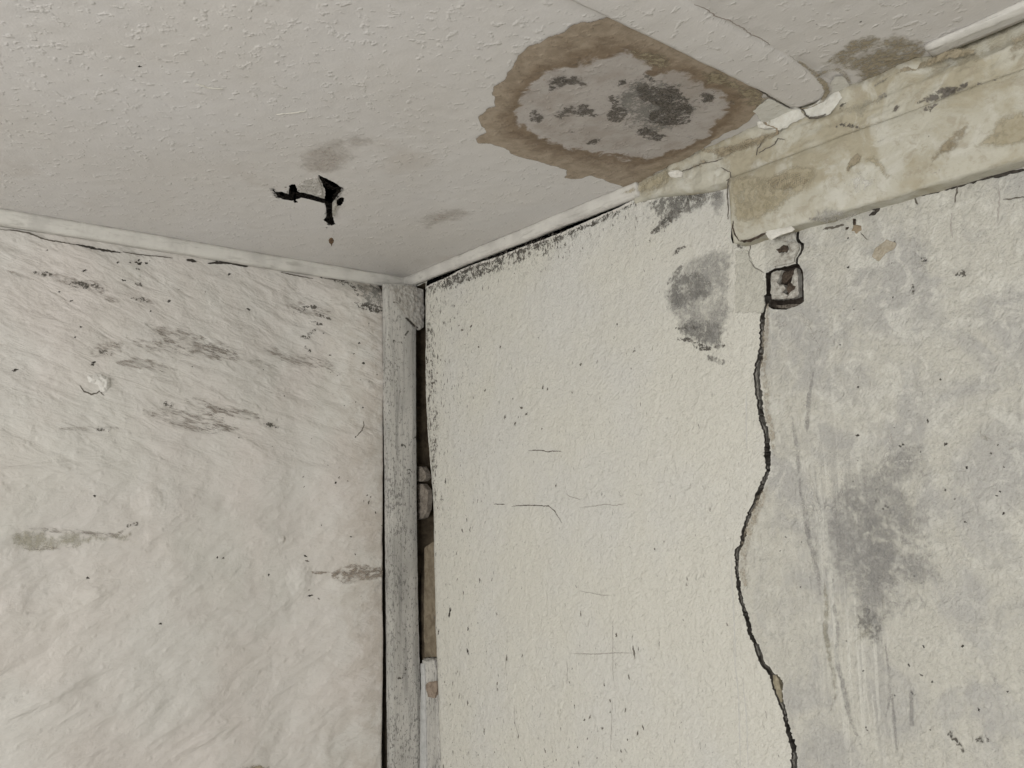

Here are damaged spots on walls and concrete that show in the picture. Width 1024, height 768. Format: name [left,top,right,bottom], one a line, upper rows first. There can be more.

flaking render [753,76,850,134]
water stain [425,17,779,295]
flaking render [668,170,684,178]
peeling [845,219,866,239]
crack [914,169,1024,238]
water stain [667,246,729,365]
crack [683,159,844,768]